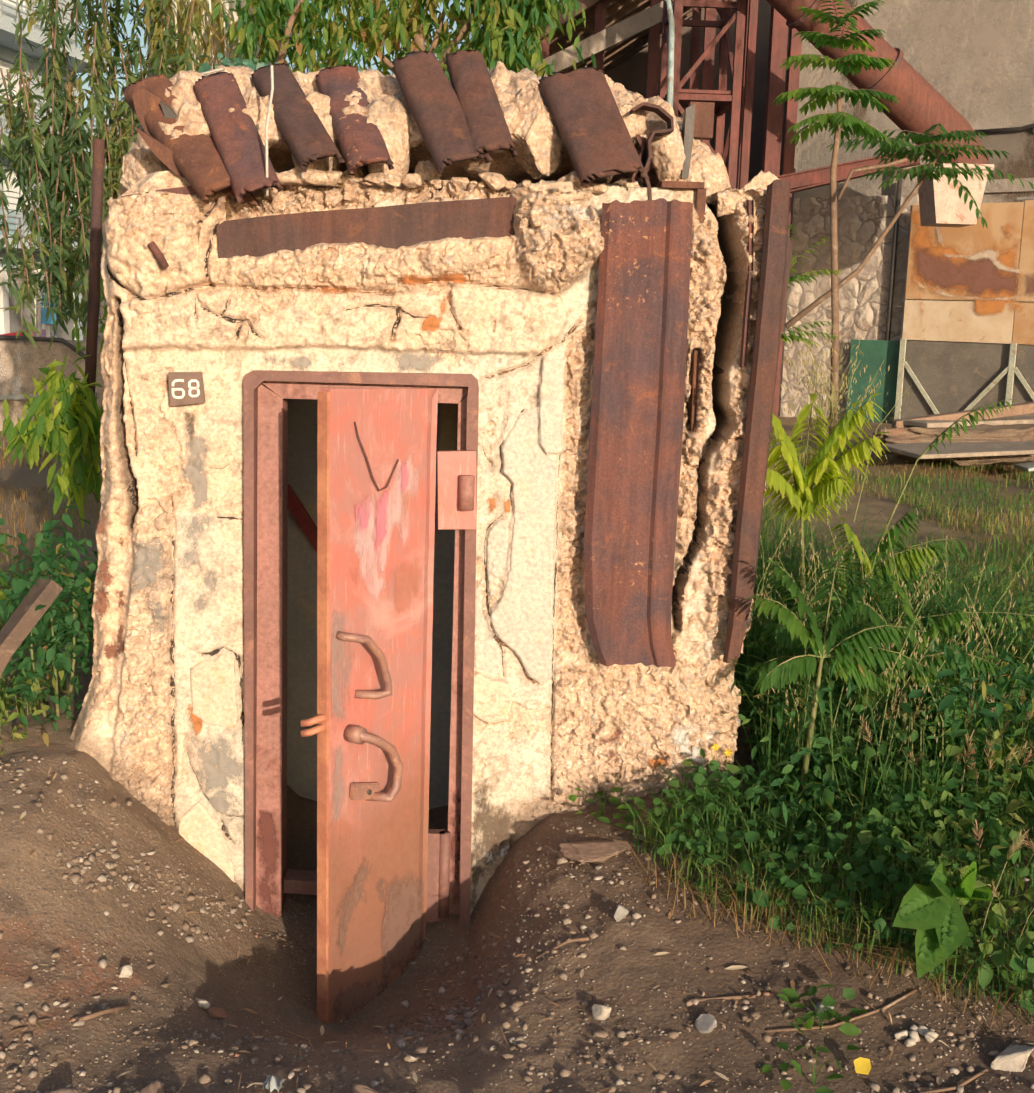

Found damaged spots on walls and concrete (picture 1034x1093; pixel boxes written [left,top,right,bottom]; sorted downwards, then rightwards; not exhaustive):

crack [107,200,561,340]
crack [119,362,139,511]
crack [485,322,579,378]
crack [712,362,724,374]
crack [672,435,717,624]
crack [483,442,560,787]